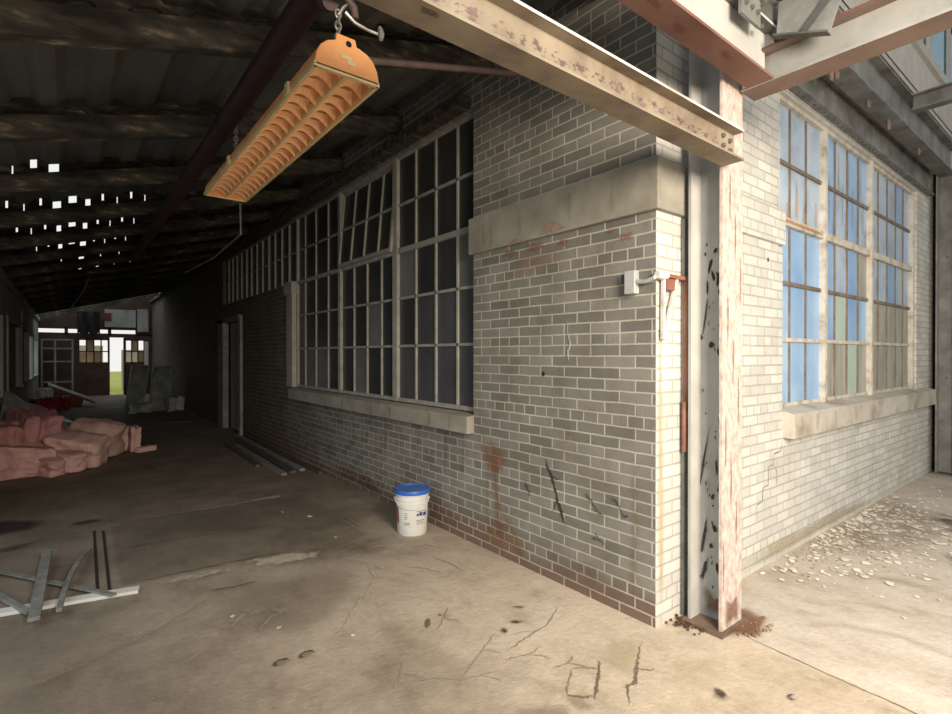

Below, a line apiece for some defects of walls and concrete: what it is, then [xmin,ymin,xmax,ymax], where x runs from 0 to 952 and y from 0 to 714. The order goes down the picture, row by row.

peeling [493,21,716,140]
peeling [701,243,719,355]
crack [545,457,565,524]
crack [585,494,628,545]
peeling [700,417,719,508]
peeling [700,519,719,589]
rust [706,590,764,633]
crack [393,606,587,689]
crack [625,646,653,703]